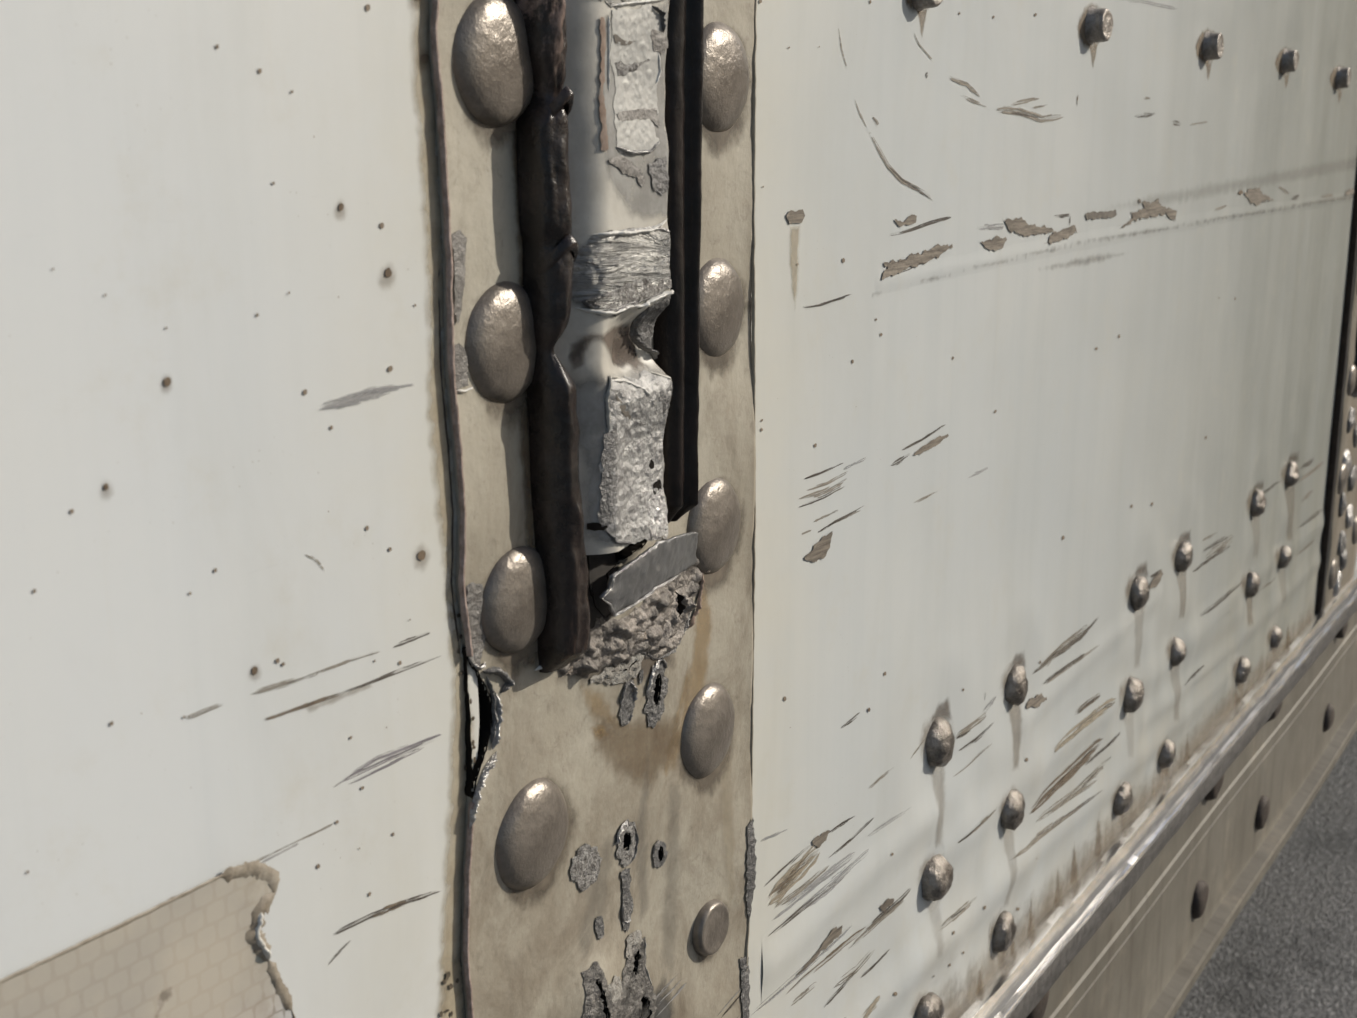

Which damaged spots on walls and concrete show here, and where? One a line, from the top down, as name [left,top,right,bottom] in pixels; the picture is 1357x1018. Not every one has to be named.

rust [906,0,926,31]
rust [1078,6,1097,63]
rust [1196,30,1211,77]
peeling [599,0,669,196]
peeling [1238,186,1299,206]
peeling [891,214,951,236]
peeling [981,198,1177,251]
peeling [572,218,674,317]
peeling [882,244,953,280]
peeling [587,369,673,547]